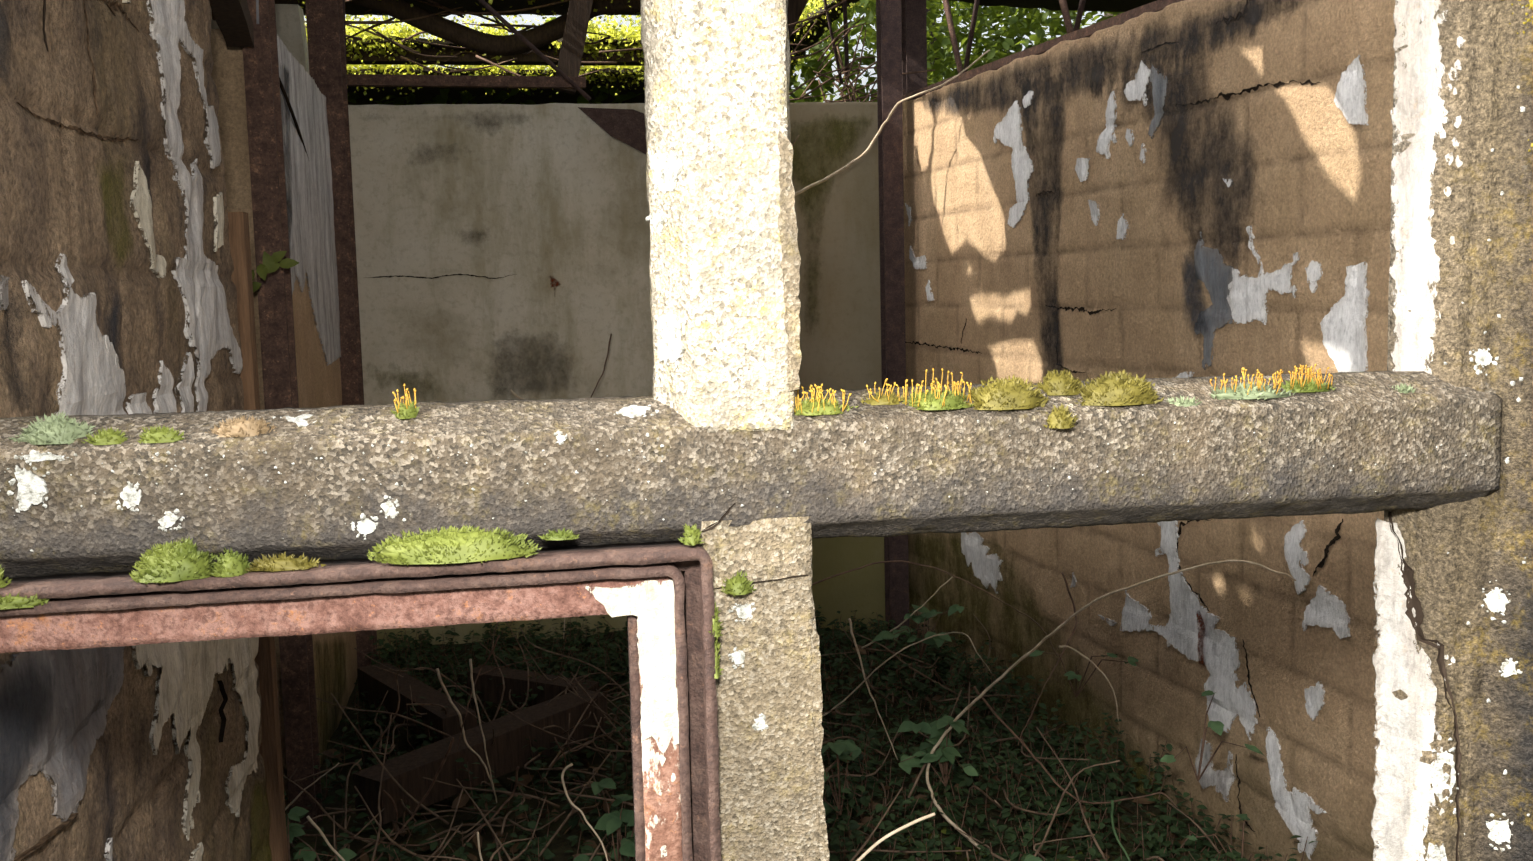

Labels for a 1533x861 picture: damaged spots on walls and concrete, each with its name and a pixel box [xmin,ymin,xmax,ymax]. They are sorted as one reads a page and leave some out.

crack [16,0,139,142]
peeling [0,0,243,416]
damp [791,119,867,219]
peeling [993,91,1034,228]
damp [924,0,1296,374]
peeling [1075,60,1169,182]
peeling [0,637,260,861]
peeling [1098,521,1326,860]
peeling [1284,520,1351,639]
crack [1313,519,1343,576]
peeling [1371,517,1456,861]
crack [1388,511,1462,861]